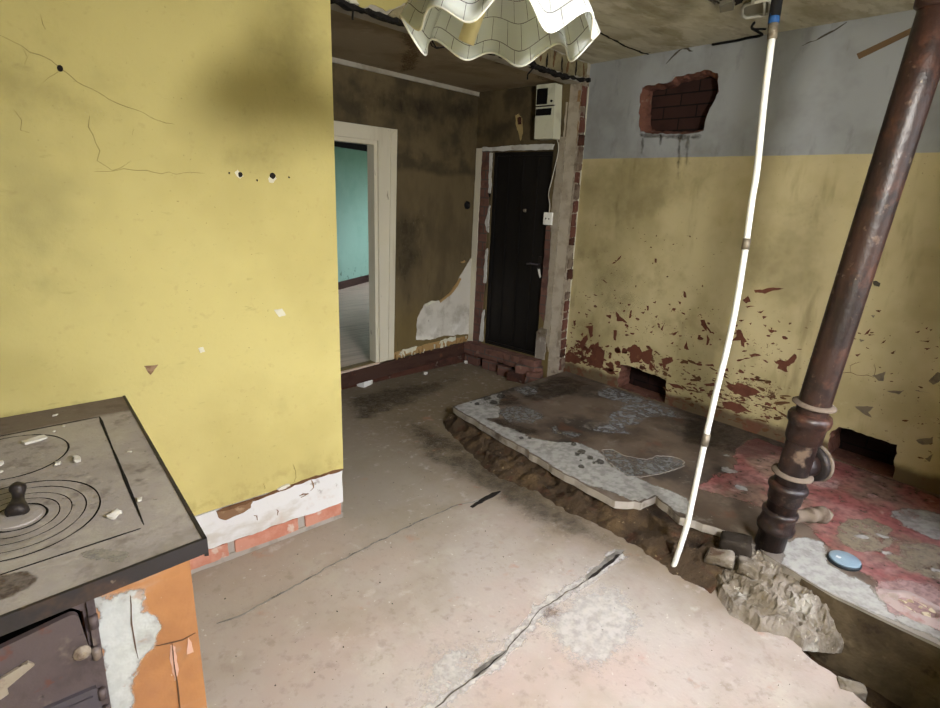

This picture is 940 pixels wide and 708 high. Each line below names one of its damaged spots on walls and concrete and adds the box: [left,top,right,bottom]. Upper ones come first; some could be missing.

spalling [330,0,409,27]
crack [600,32,692,64]
crack [708,0,743,8]
crack [804,22,847,45]
crack [0,35,171,134]
crack [88,116,197,175]
spalling [416,49,805,508]
peeling [872,367,904,394]
peeling [916,327,940,398]
spalling [190,469,343,574]
peeling [798,460,940,632]
spalling [716,548,844,654]